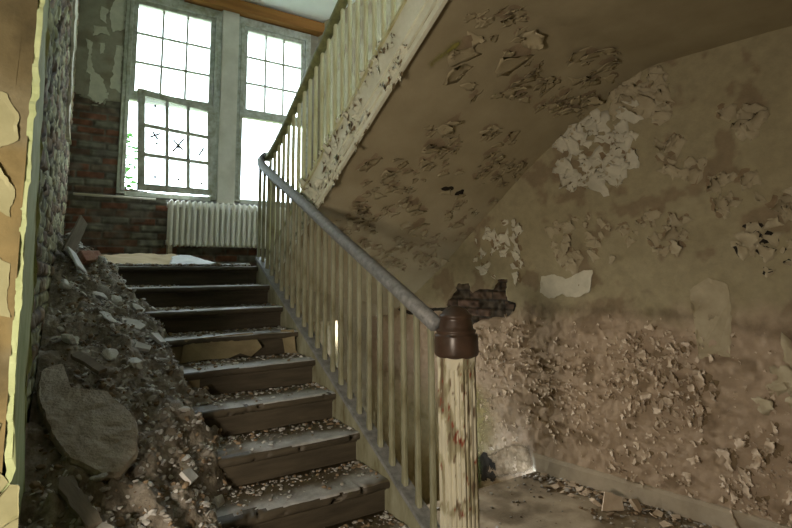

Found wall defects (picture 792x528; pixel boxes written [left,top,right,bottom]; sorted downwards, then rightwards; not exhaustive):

flaking render [0,0,266,528]
peeling [298,33,408,207]
peeling [332,112,463,270]
peeling [443,5,675,197]
peeling [439,186,792,528]